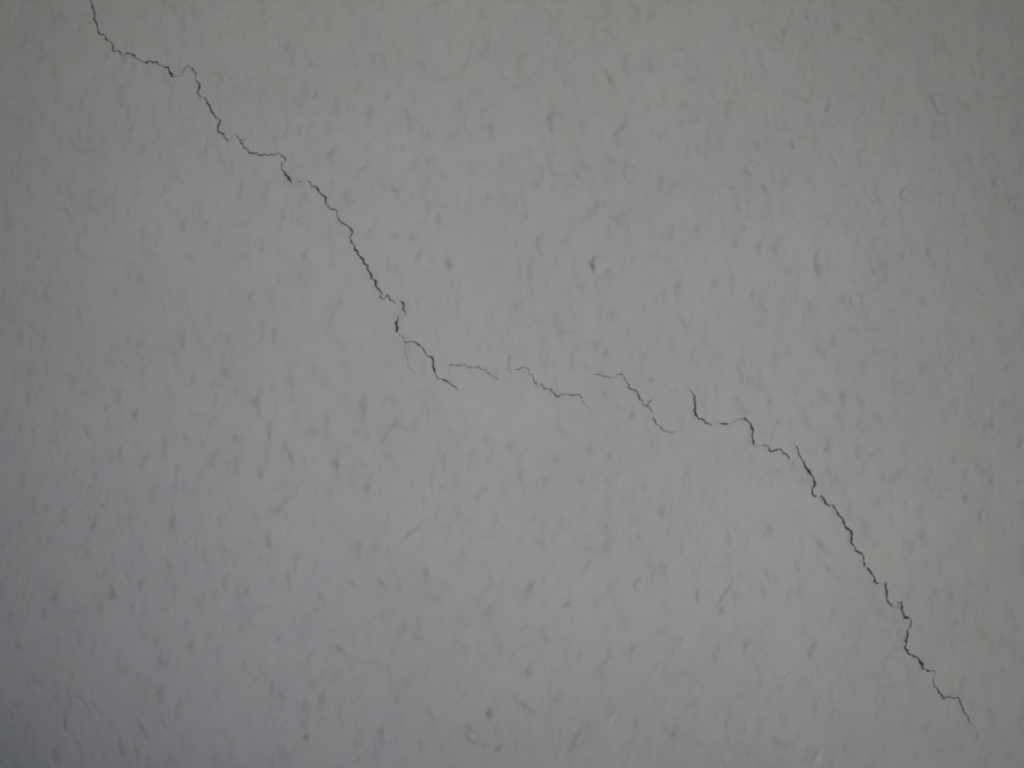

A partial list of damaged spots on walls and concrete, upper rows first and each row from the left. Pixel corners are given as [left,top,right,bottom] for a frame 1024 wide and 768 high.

crack [90,0,591,410]
crack [596,373,671,433]
crack [689,389,978,742]